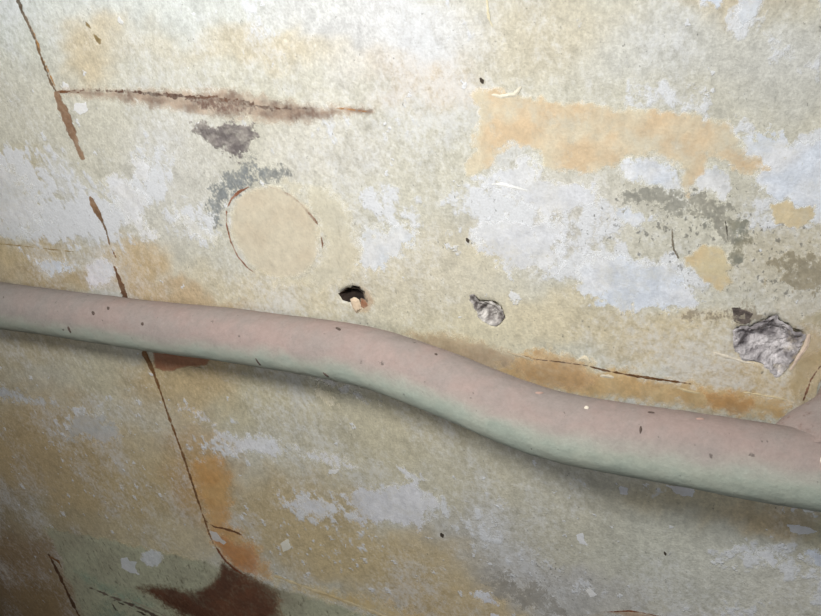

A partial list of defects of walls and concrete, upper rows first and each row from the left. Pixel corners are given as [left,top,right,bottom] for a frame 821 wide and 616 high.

crack [16,0,85,160]
flaking render [466,86,821,279]
peeling [18,246,118,291]
crack [89,196,127,298]
spalling [469,294,505,326]
peeling [575,245,732,315]
spalling [713,307,810,377]
water stain [789,337,821,404]
crack [142,351,241,543]
corrosion [138,458,279,616]
crack [48,554,80,616]
crack [89,587,166,616]